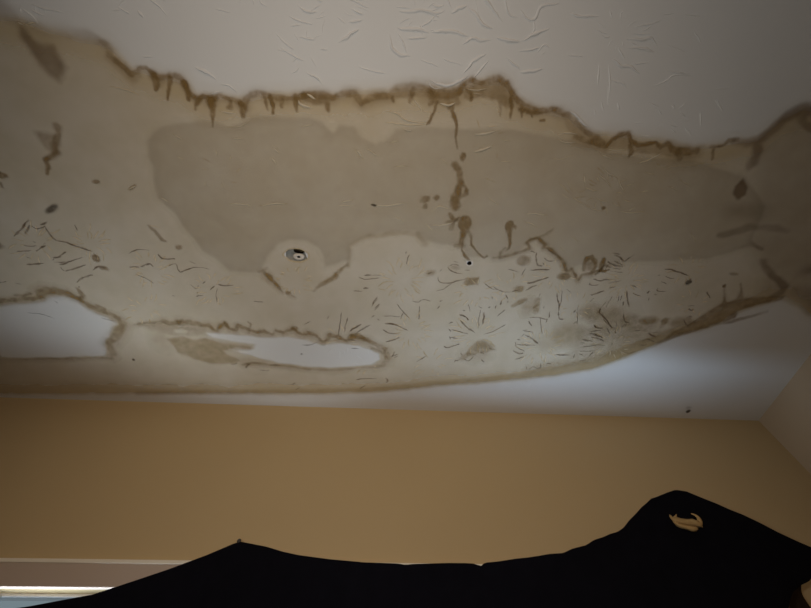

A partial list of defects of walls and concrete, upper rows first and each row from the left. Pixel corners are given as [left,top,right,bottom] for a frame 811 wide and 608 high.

damp [94,48,245,120]
damp [263,78,485,134]
damp [491,77,752,161]
crack [18,223,99,271]
damp [451,180,475,259]
damp [526,237,577,279]
damp [29,289,124,329]
crack [385,251,548,361]
crack [517,257,662,369]
damp [579,342,653,368]
damp [353,377,459,391]